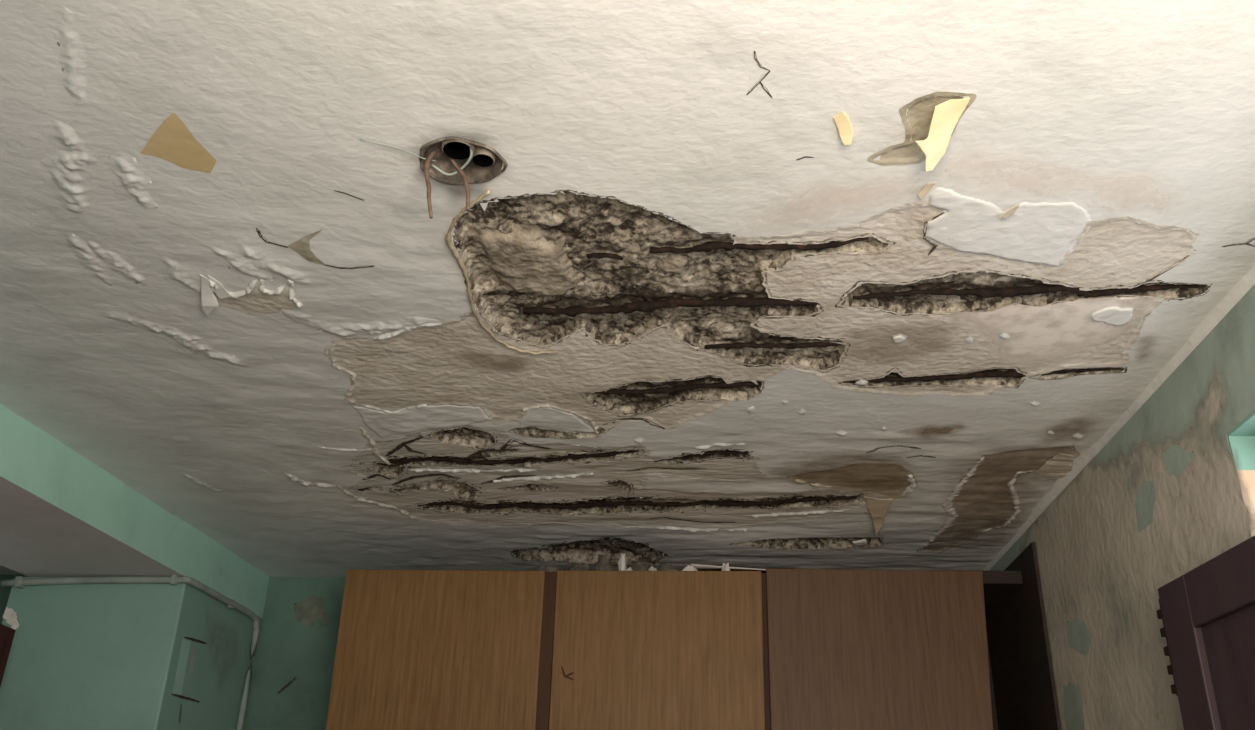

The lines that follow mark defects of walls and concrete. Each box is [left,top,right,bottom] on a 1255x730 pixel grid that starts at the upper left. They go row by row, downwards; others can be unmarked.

crack [747,51,772,98]
peeling [141,113,216,173]
peeling [288,230,325,265]
peeling [200,275,303,316]
peeling [316,92,1212,566]